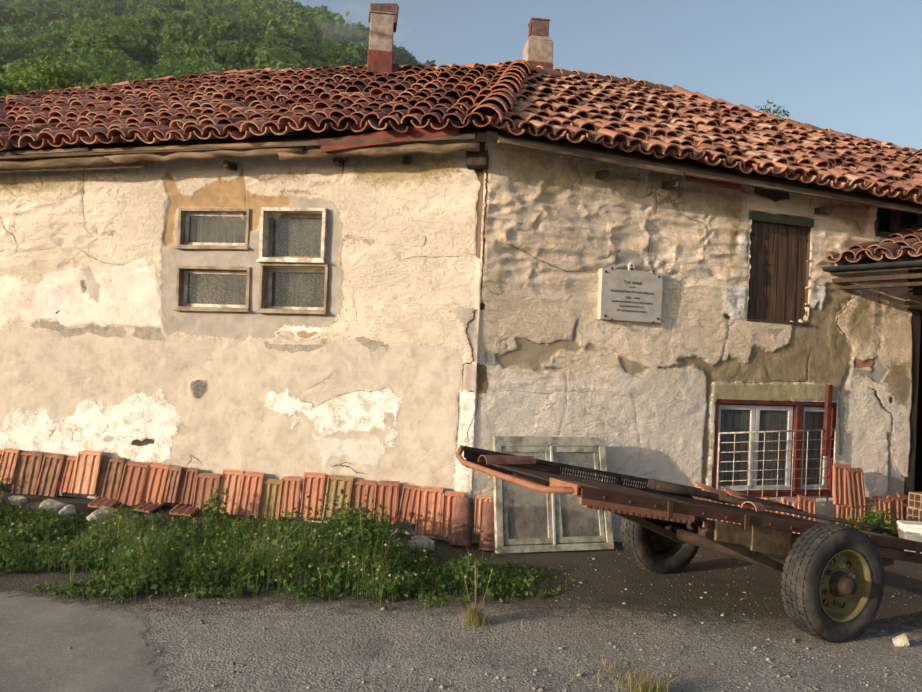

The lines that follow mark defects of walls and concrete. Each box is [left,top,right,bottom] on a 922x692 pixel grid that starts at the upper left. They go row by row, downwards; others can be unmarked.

spalling [161,169,292,247]
peeling [82,266,101,302]
crack [456,148,587,453]
peeling [0,303,604,516]
spalling [619,282,875,485]
crack [869,388,912,428]
spalling [887,432,905,496]